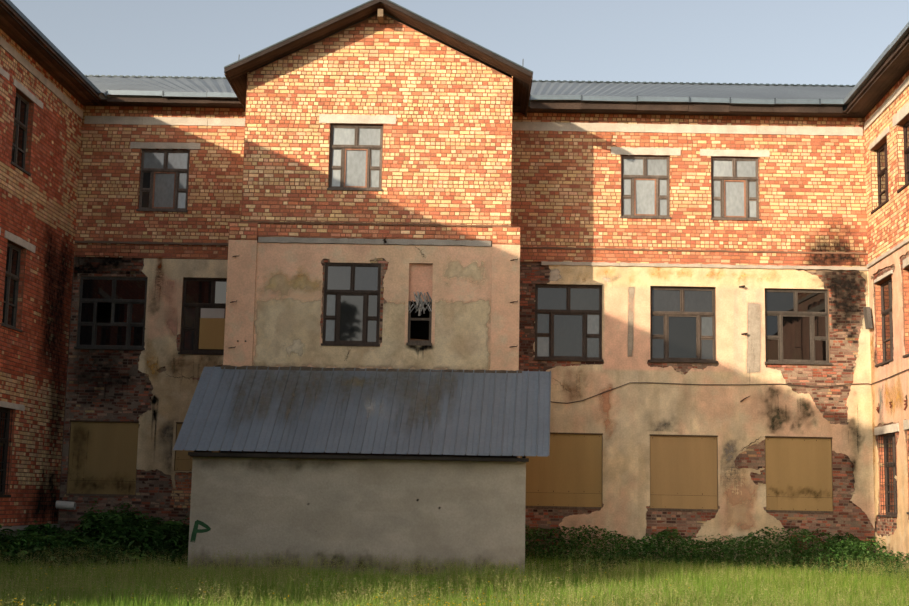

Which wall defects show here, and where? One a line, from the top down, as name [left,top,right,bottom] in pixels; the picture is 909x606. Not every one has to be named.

peeling [254,257,491,370]
flaking render [765,251,909,425]
flaking render [58,257,192,533]
water stain [765,388,813,432]
flaking render [875,399,909,463]
flaking render [525,503,604,558]
flaking render [646,506,720,540]
flaking render [763,451,897,565]